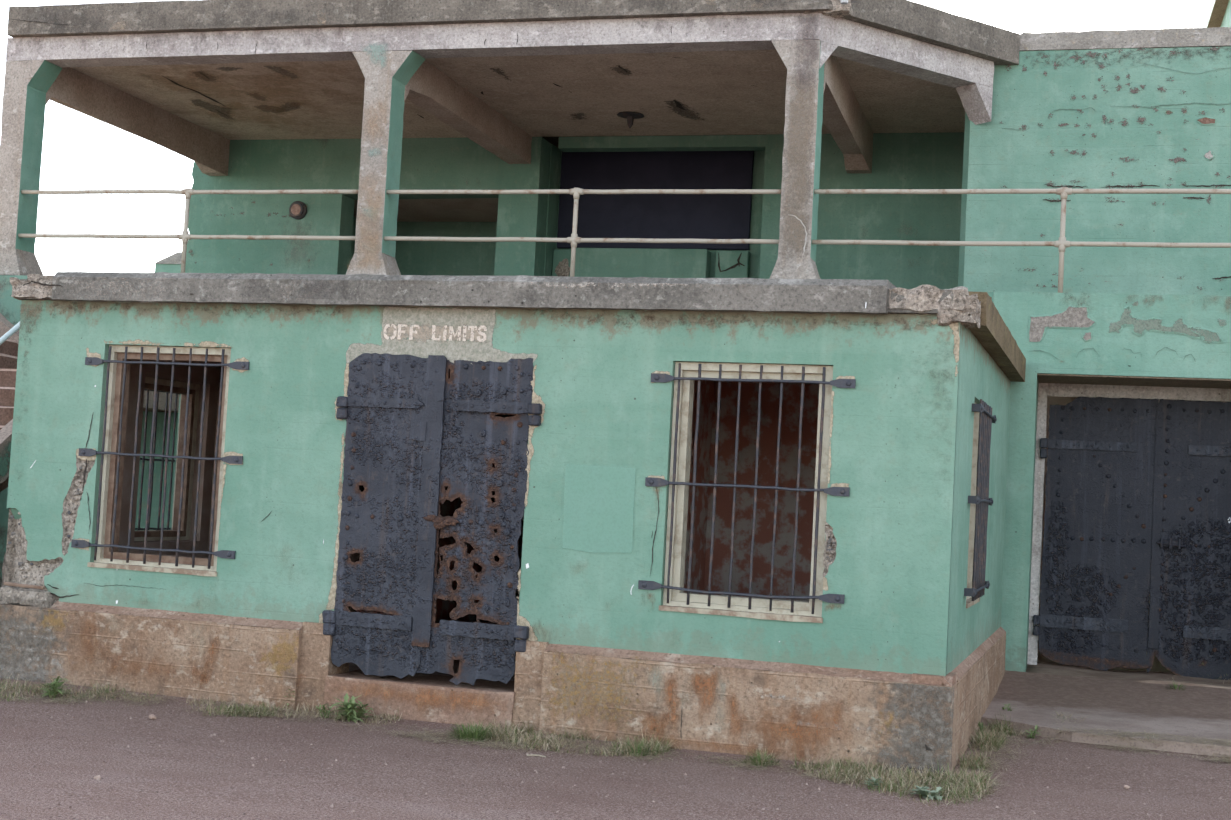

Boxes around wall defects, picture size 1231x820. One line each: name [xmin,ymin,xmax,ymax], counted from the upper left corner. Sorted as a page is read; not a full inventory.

spalling [1019,48,1225,157]
spalling [1165,148,1231,204]
peeling [931,318,960,377]
peeling [1028,302,1226,344]
peeling [828,376,855,487]
spalling [0,448,96,607]
spalling [823,522,837,591]